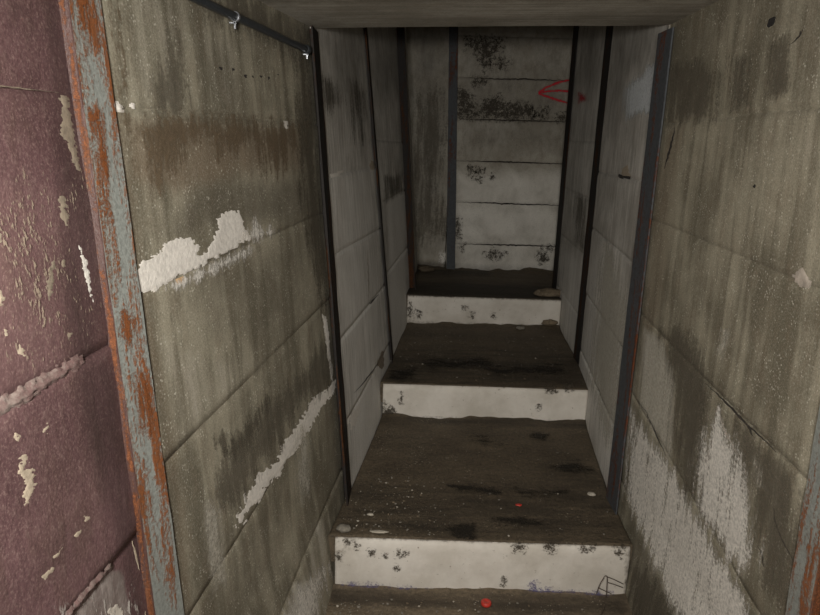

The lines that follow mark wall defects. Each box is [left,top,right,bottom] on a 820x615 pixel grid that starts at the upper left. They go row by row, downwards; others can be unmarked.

leakage [457,33,566,124]
flaking render [58,95,81,171]
peeling [46,259,66,301]
peeling [58,196,70,226]
flaking render [78,246,94,302]
corrosion [60,0,154,472]
leakage [591,242,627,436]
leakage [622,331,793,615]
corrosion [132,492,154,615]
leakage [446,523,476,540]